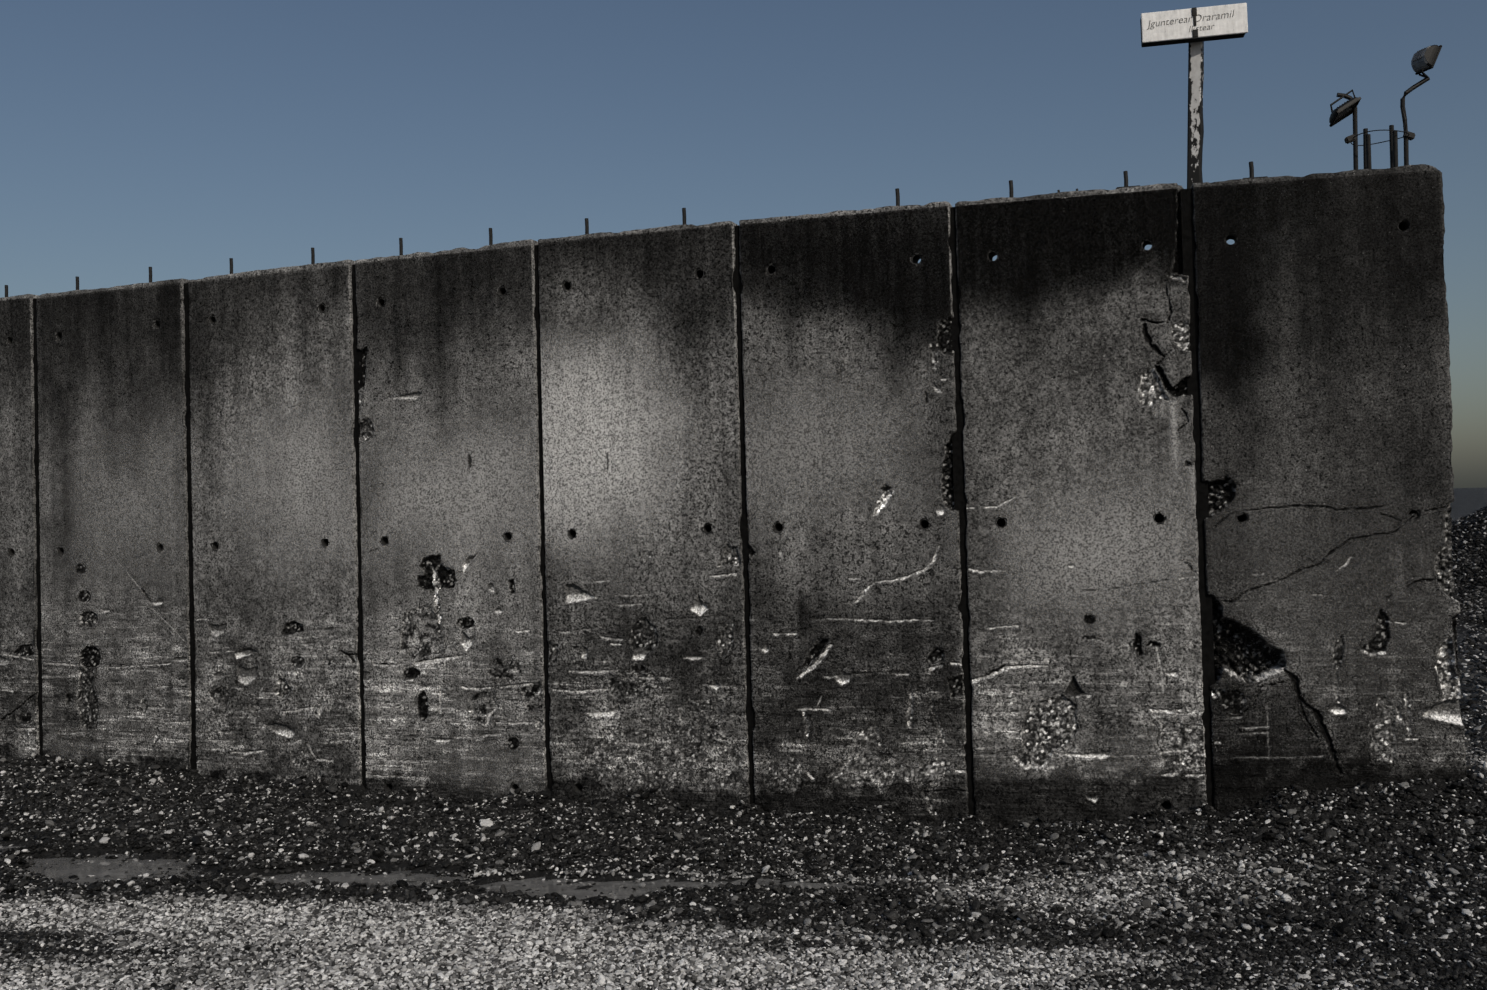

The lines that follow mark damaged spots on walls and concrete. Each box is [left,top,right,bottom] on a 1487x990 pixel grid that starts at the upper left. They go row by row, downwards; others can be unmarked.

crack [1137,278,1175,367]
spalling [397,550,481,745]
spalling [484,576,518,617]
spalling [1209,591,1290,717]
crack [1081,501,1447,606]
spalling [1156,716,1205,780]
crack [1225,665,1345,779]